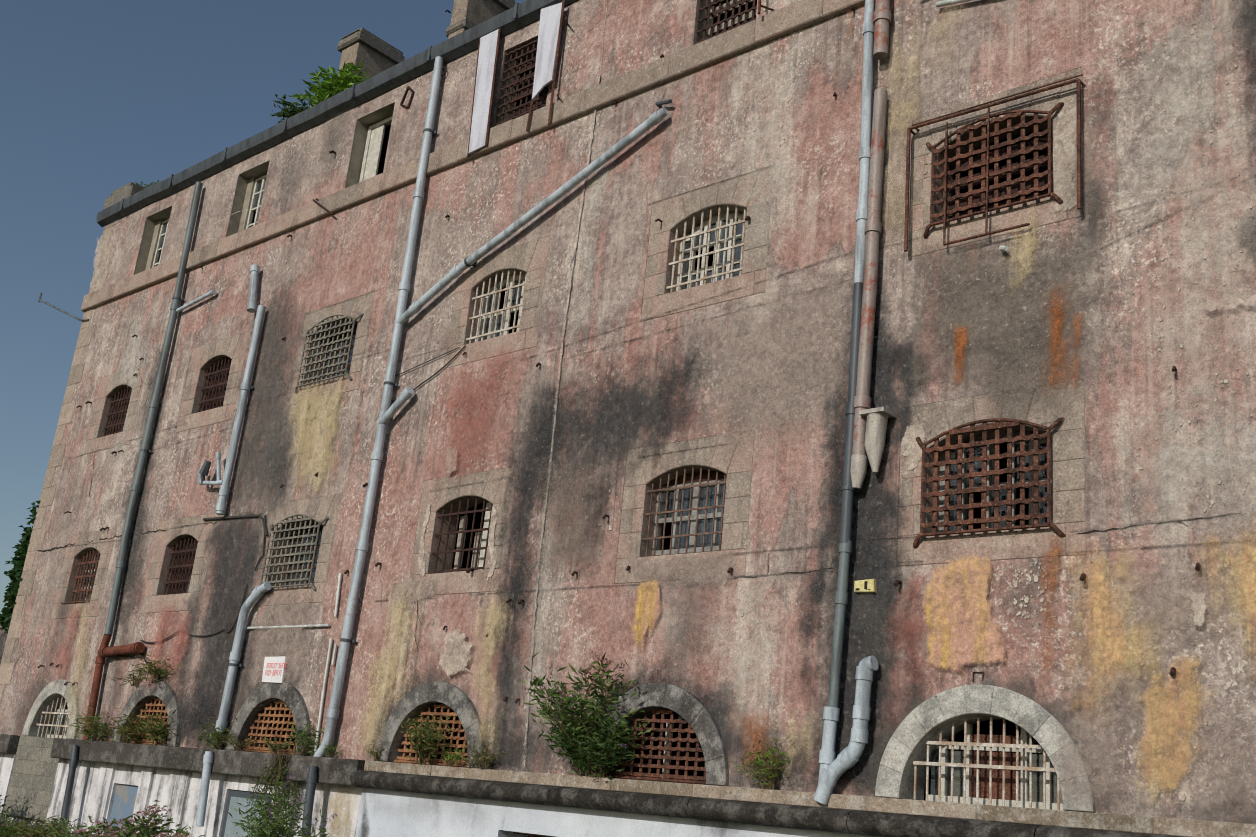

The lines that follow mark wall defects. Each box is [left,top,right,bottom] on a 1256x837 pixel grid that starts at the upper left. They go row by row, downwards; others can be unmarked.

leakage [155,291,341,749]
peeling [437,627,473,676]
leakage [479,355,700,704]
leakage [721,243,1092,793]
rust [955,328,967,377]
leakage [1047,708,1100,803]